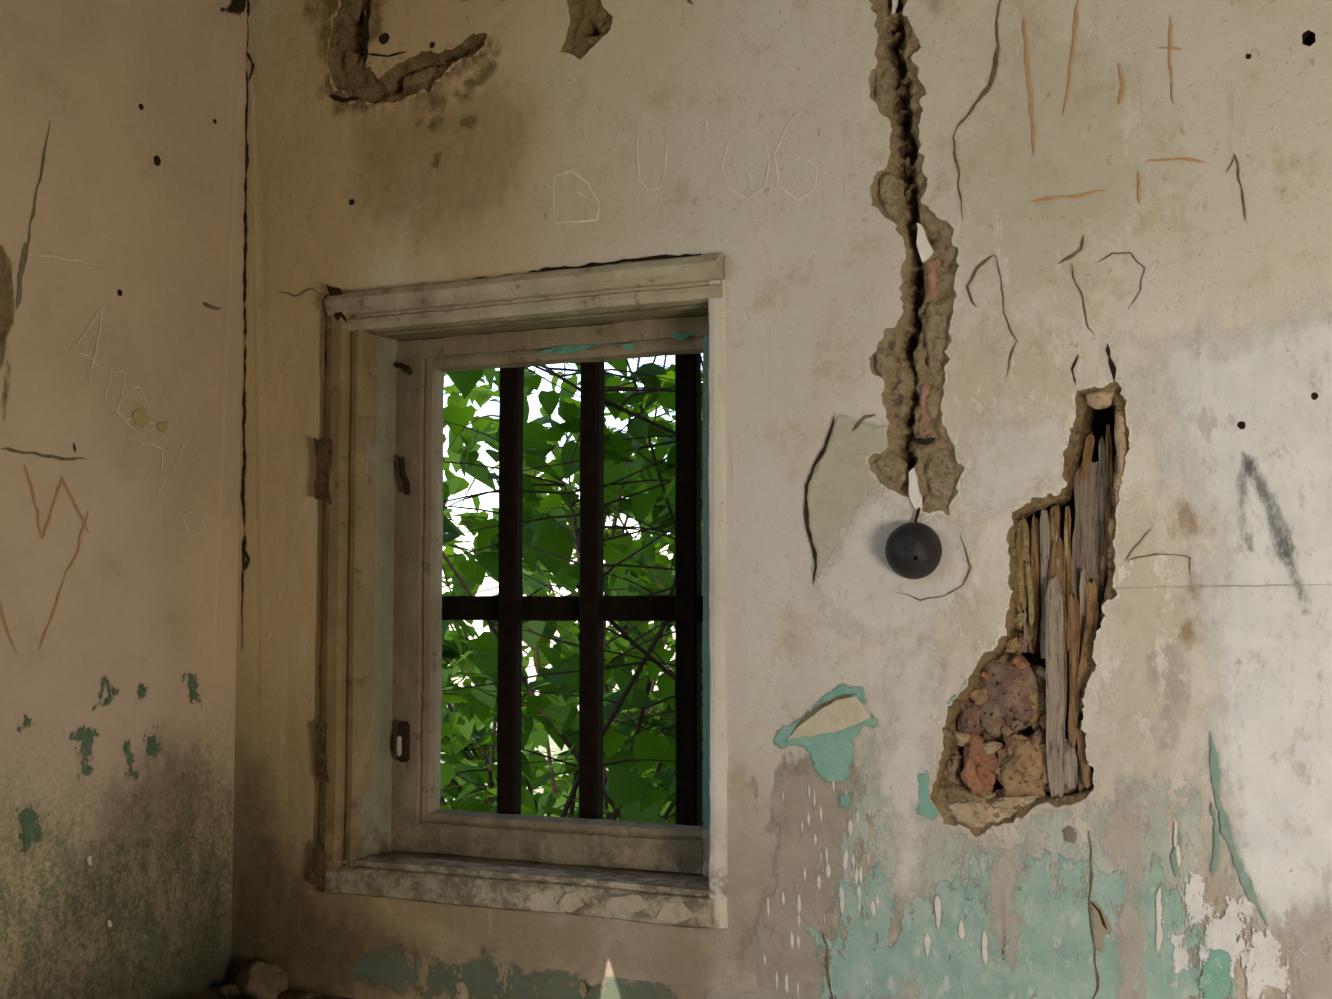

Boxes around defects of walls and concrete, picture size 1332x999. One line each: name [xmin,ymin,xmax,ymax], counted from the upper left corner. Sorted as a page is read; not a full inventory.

flaking render [306,0,490,111]
flaking render [560,0,613,60]
crack [241,0,255,643]
crack [867,0,972,601]
crack [1058,234,1145,333]
peeling [93,676,119,711]
peeling [182,673,203,704]
peeling [704,344,1269,999]
peeling [69,725,99,778]
peeling [123,734,160,780]
peeling [16,805,42,855]
peeling [351,946,678,999]